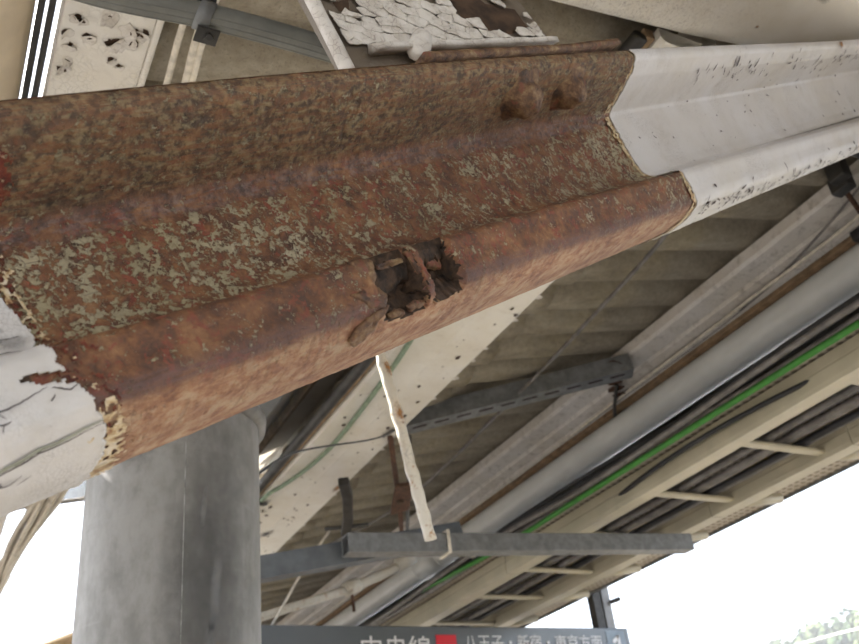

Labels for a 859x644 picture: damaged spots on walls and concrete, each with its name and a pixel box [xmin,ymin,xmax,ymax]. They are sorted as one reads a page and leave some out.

peeling [55,9,150,76]
peeling [332,0,389,18]
peeling [450,0,527,34]
rust [0,51,696,473]
spalling [346,251,441,347]
crack [0,382,79,433]
crack [0,419,105,489]